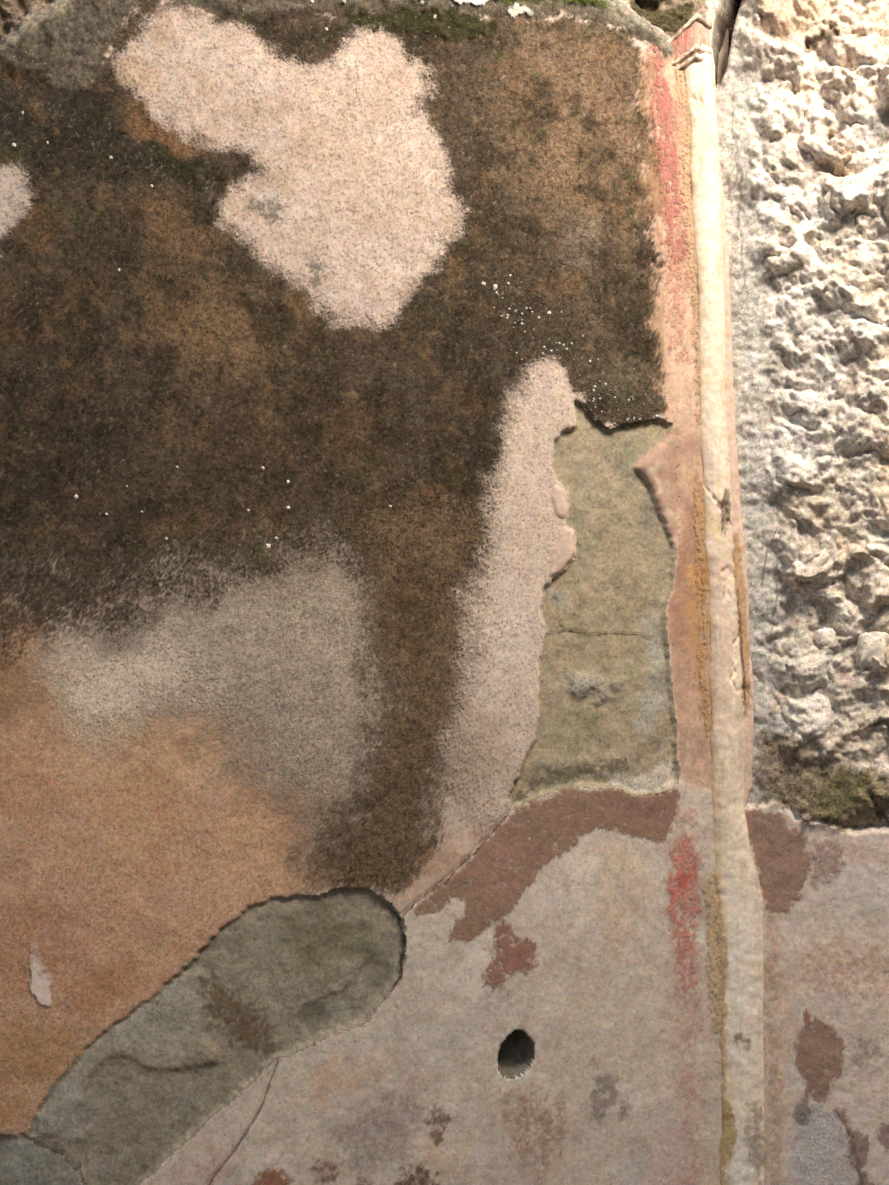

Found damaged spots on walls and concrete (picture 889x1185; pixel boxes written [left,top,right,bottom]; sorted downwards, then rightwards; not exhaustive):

water stain [0,0,677,898]
spalling [508,400,681,810]
spalling [0,886,406,1185]
crack [208,1060,279,1185]